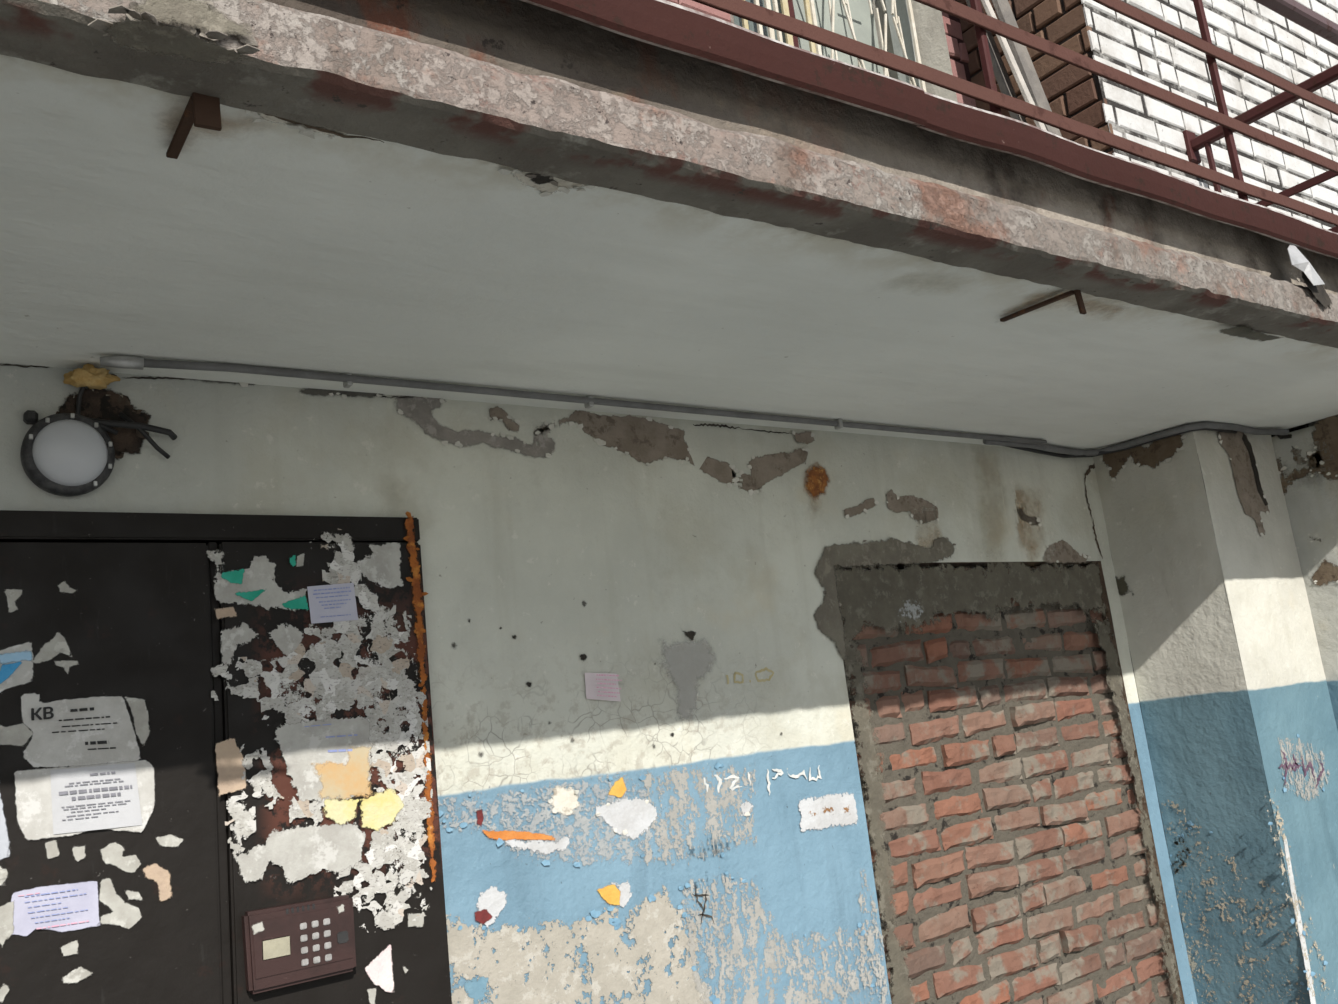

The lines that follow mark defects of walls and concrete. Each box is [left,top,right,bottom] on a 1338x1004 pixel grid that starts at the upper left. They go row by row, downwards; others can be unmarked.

spalling [301,388,815,495]
rust [805,464,830,498]
spalling [843,489,939,524]
spalling [1017,507,1042,526]
spalling [1100,435,1186,482]
spalling [1218,431,1270,536]
spalling [1276,415,1338,493]
spalling [1043,540,1091,563]
spalling [1312,559,1338,586]
peeling [438,762,889,1004]